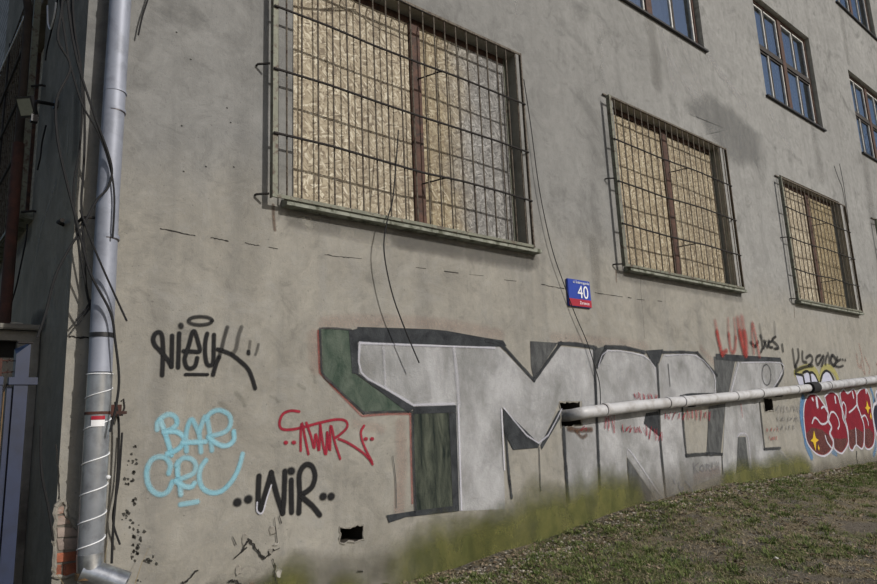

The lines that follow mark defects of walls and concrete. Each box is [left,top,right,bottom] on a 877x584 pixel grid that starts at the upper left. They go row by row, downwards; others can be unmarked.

flaking render [51,499,78,580]
crack [228,516,282,584]
spalling [338,524,365,545]